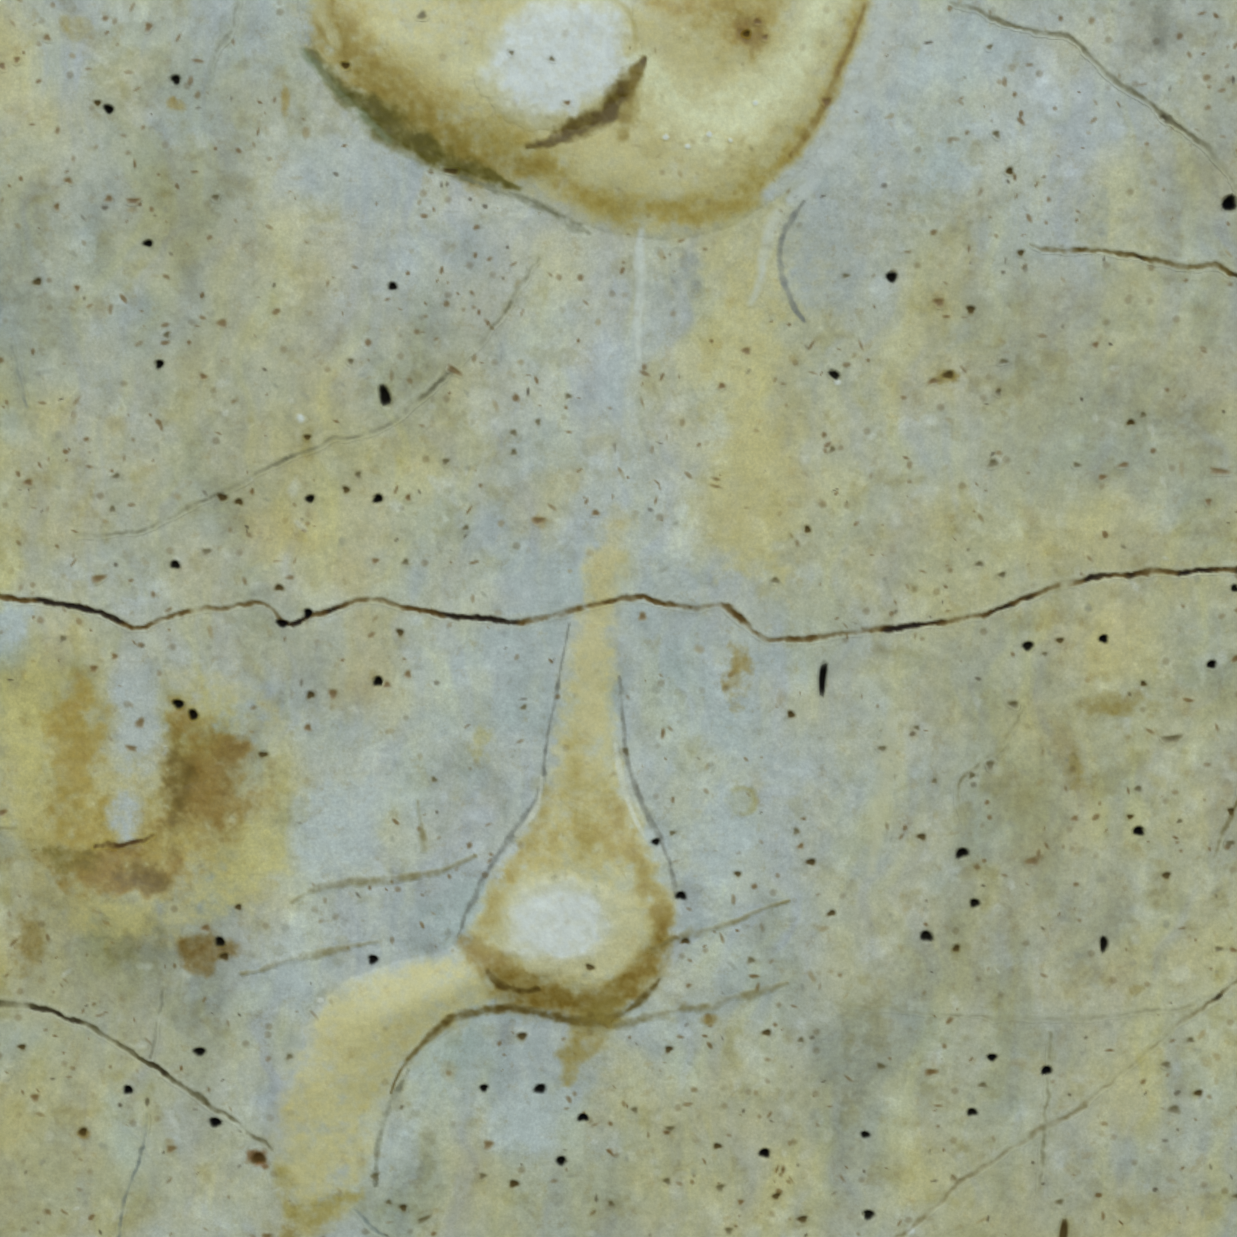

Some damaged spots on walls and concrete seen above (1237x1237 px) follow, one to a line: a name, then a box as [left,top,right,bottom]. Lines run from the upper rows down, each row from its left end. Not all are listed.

crack [947,0,1237,194]
crack [1027,242,1237,281]
crack [0,563,1237,645]
crack [91,832,157,852]
crack [1207,782,1237,864]
crack [0,986,276,1152]
crack [889,977,1237,1237]
crack [115,1111,150,1237]
crack [350,1206,395,1237]